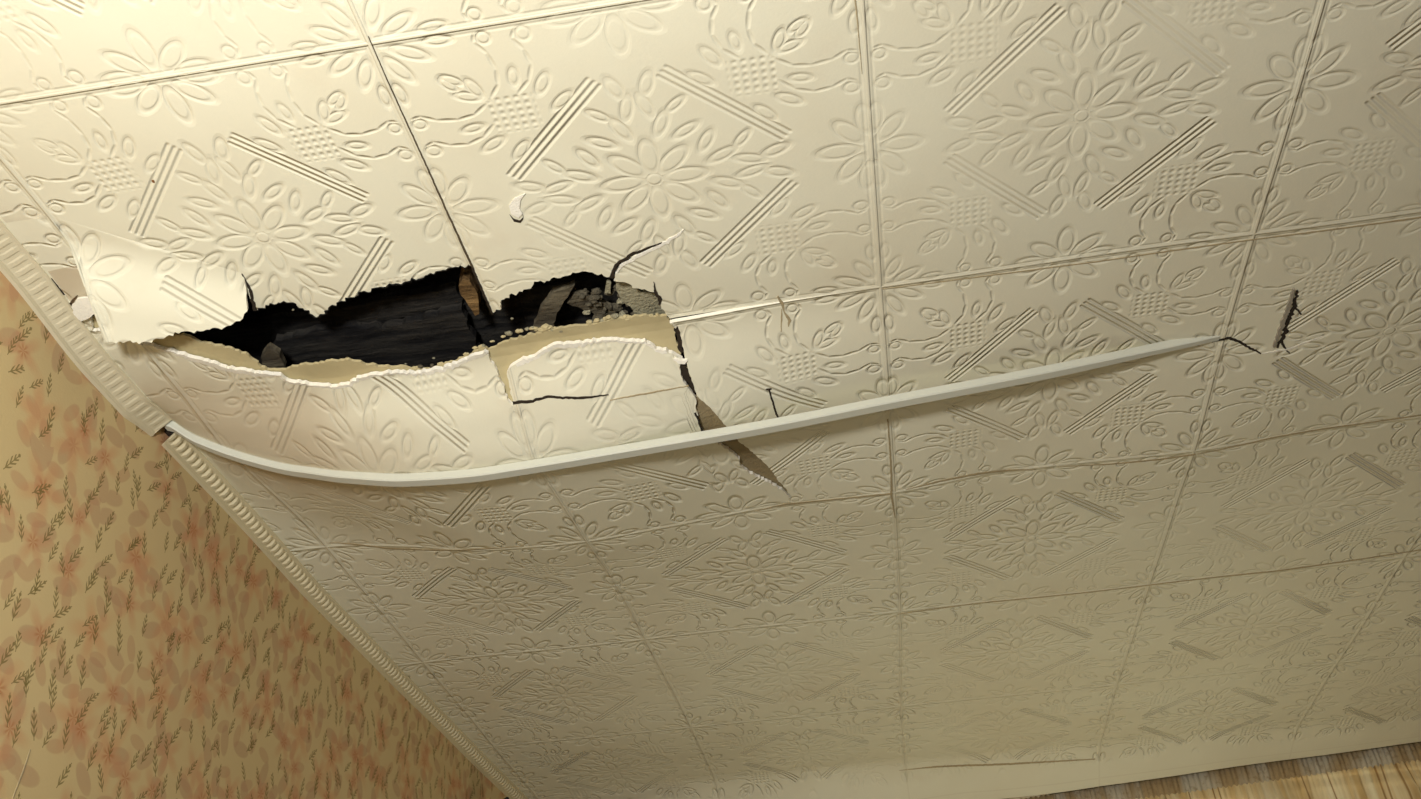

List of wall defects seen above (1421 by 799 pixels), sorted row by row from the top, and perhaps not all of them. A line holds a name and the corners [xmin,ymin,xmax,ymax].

crack [513,229,703,431]
crack [1214,288,1323,354]